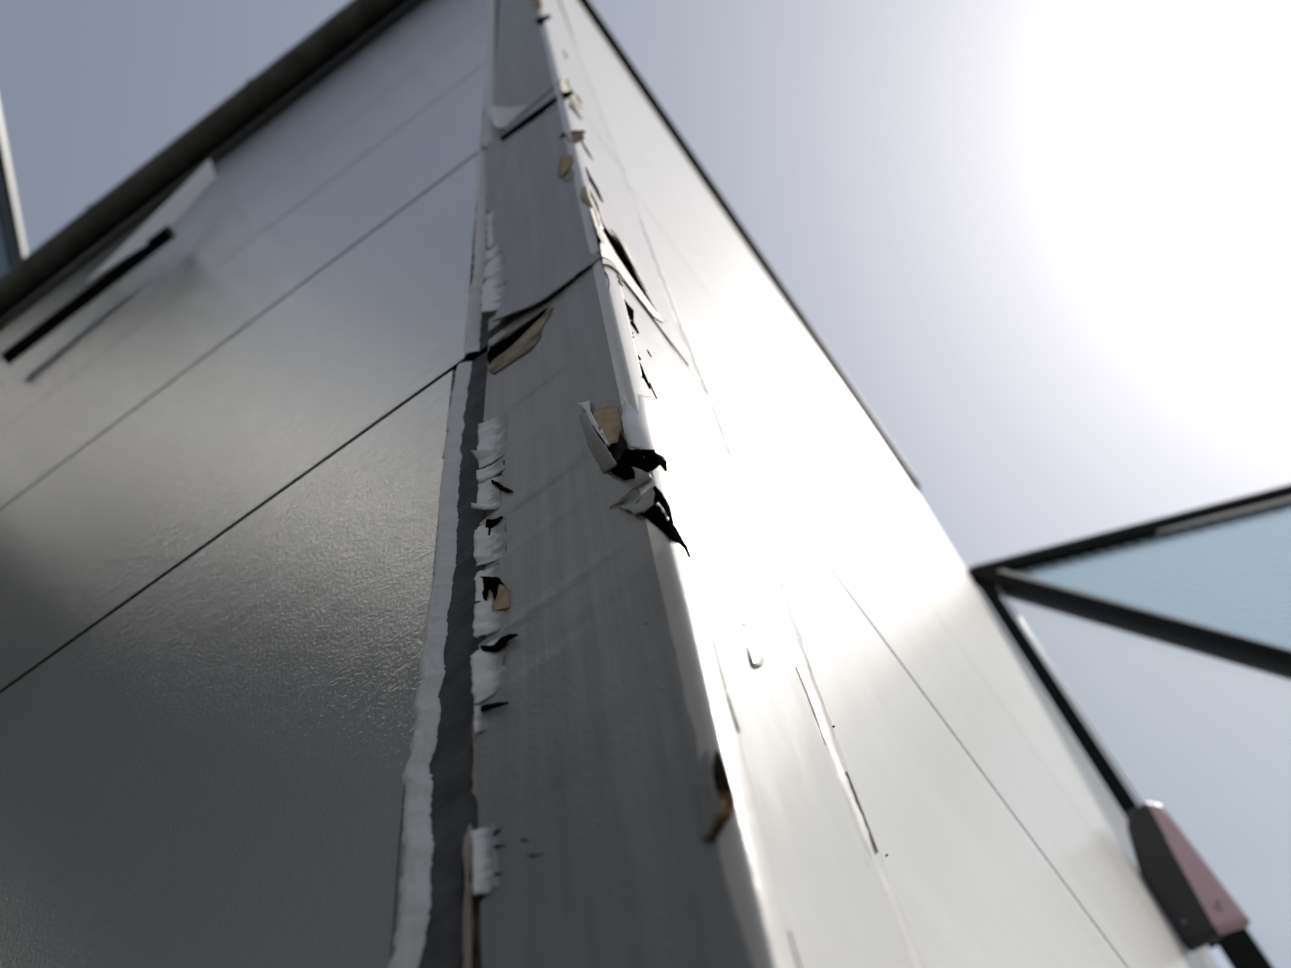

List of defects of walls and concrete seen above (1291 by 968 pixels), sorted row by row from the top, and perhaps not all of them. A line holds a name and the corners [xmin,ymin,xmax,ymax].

peeling [480,78,664,374]
peeling [577,350,691,558]
peeling [470,413,518,734]
peeling [470,823,499,896]
peeling [695,750,736,842]